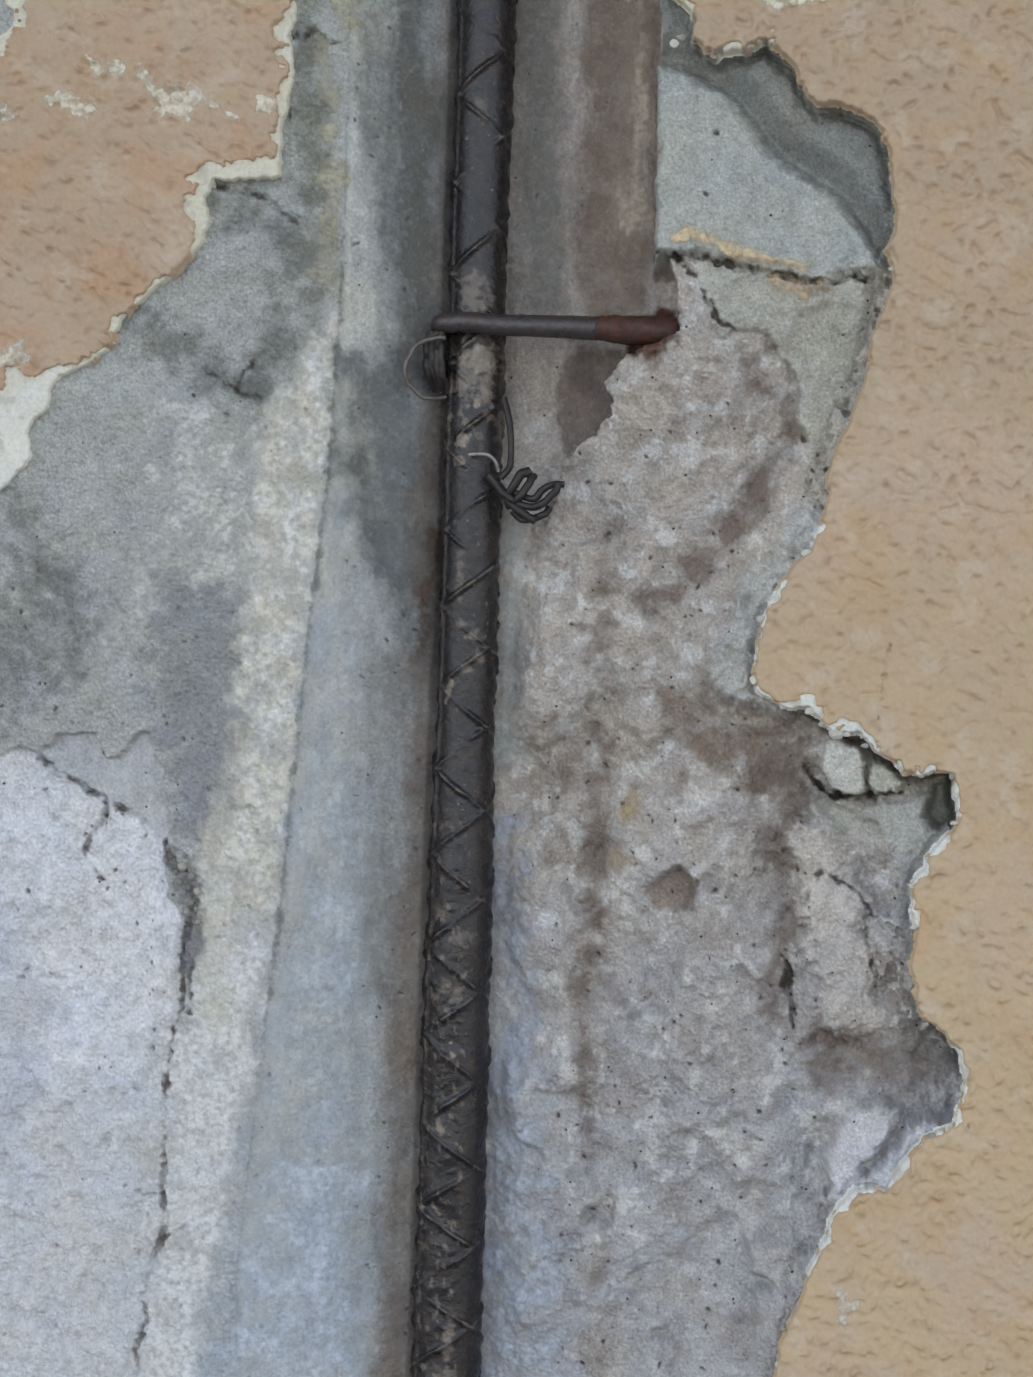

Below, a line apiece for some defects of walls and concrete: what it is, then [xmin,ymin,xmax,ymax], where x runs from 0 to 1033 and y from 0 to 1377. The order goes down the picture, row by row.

crack [654,251,867,331]
corrosion [558,308,679,455]
peeling [0,0,352,1377]
spalling [500,0,969,1377]
crack [161,839,198,1092]
crack [145,1137,170,1259]
crack [134,1302,148,1369]